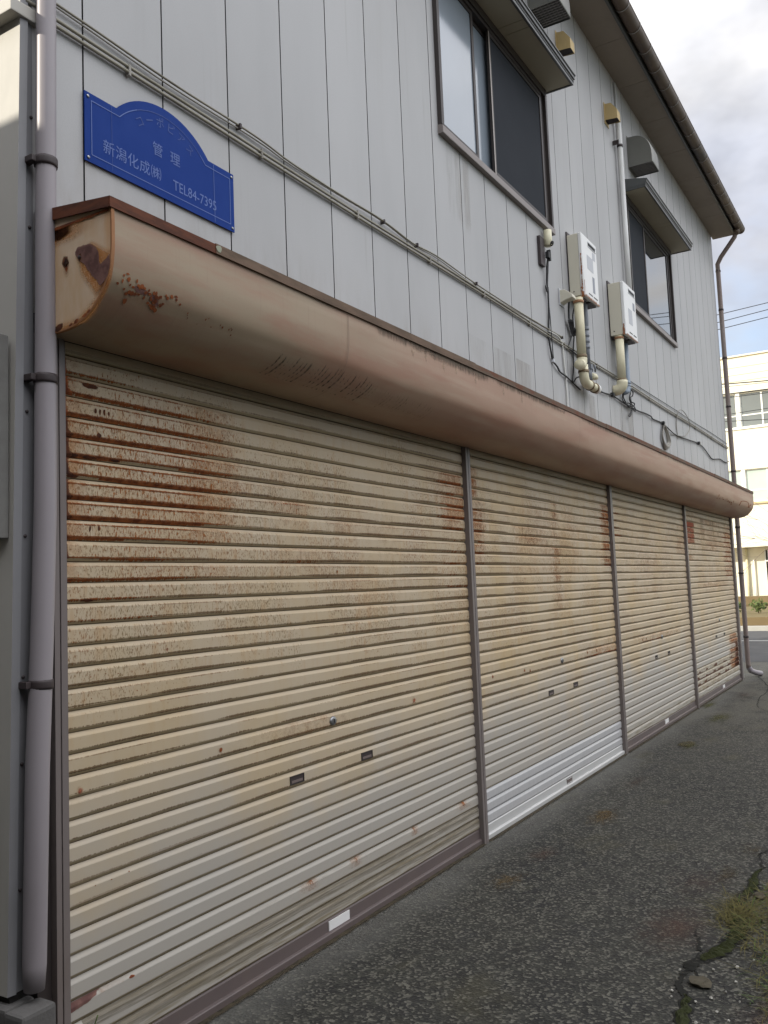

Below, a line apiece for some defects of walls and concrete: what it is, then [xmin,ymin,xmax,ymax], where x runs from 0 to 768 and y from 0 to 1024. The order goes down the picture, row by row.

corrosion [54,208,209,332]
corrosion [65,358,251,583]
corrosion [436,473,487,599]
corrosion [600,505,622,566]
corrosion [730,633,739,668]